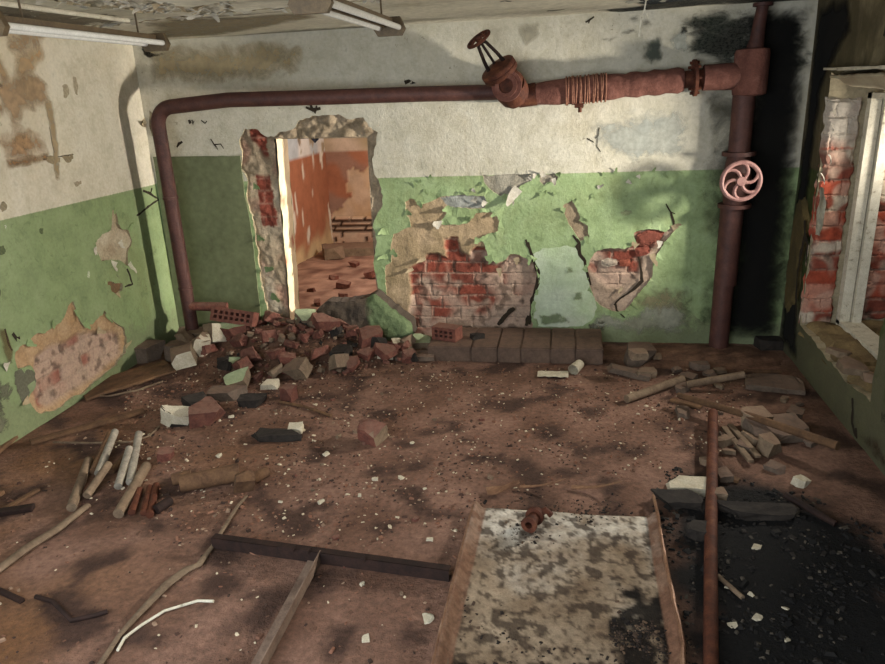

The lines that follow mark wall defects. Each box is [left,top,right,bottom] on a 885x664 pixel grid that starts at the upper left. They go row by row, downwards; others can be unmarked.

spalling [35,0,233,15]
leakage [0,35,59,179]
peeling [94,206,137,273]
spalling [241,114,561,336]
spalling [560,198,681,311]
leakage [0,383,13,433]
spalling [3,302,132,413]